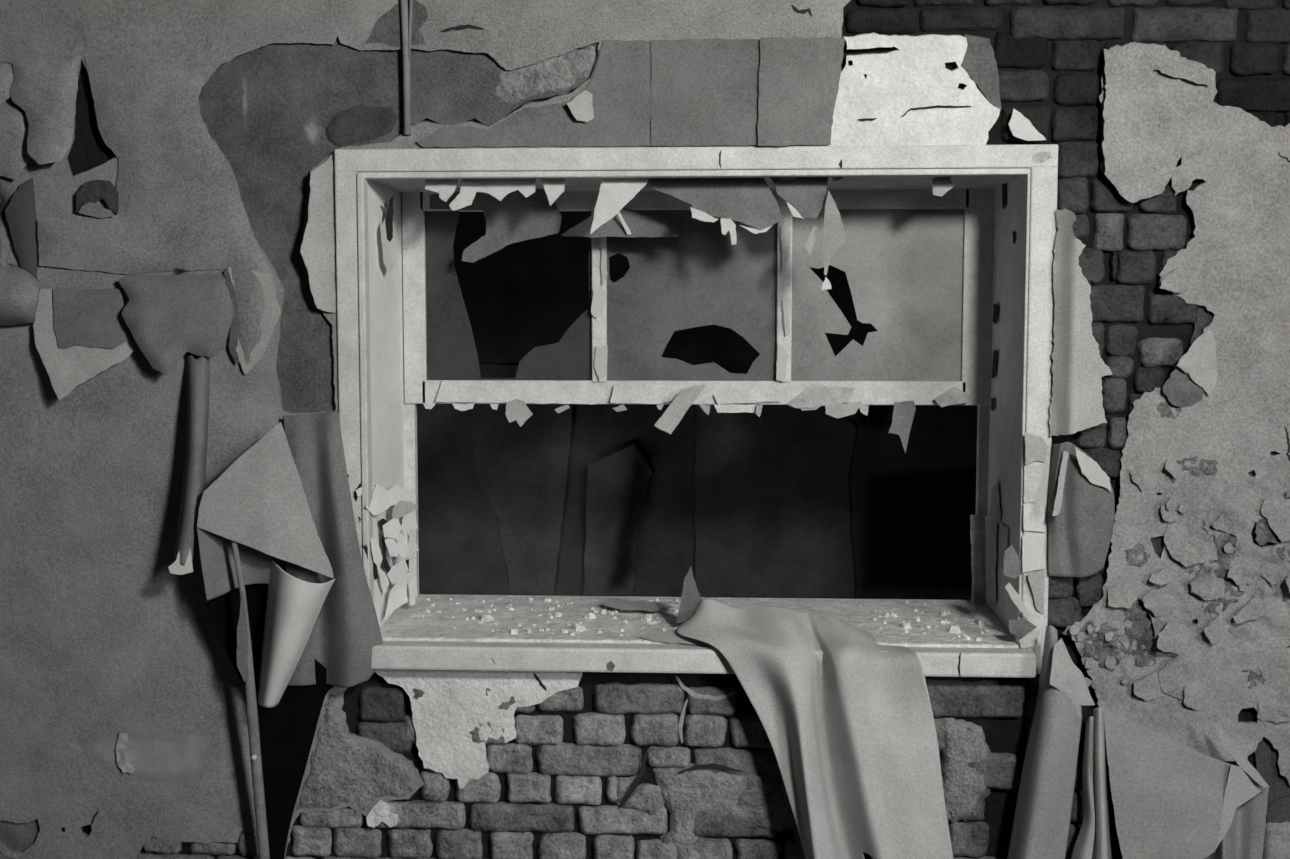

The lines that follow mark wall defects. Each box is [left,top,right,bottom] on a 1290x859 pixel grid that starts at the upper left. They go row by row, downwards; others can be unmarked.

peeling [590,177,847,319]
peeling [423,297,869,435]
flaking render [827,0,1290,824]
peeling [347,474,419,619]
flaking render [115,732,136,774]
flaking render [132,831,259,859]
flaking render [285,661,805,859]
flaking render [926,679,1039,859]
flaking render [1065,754,1084,859]